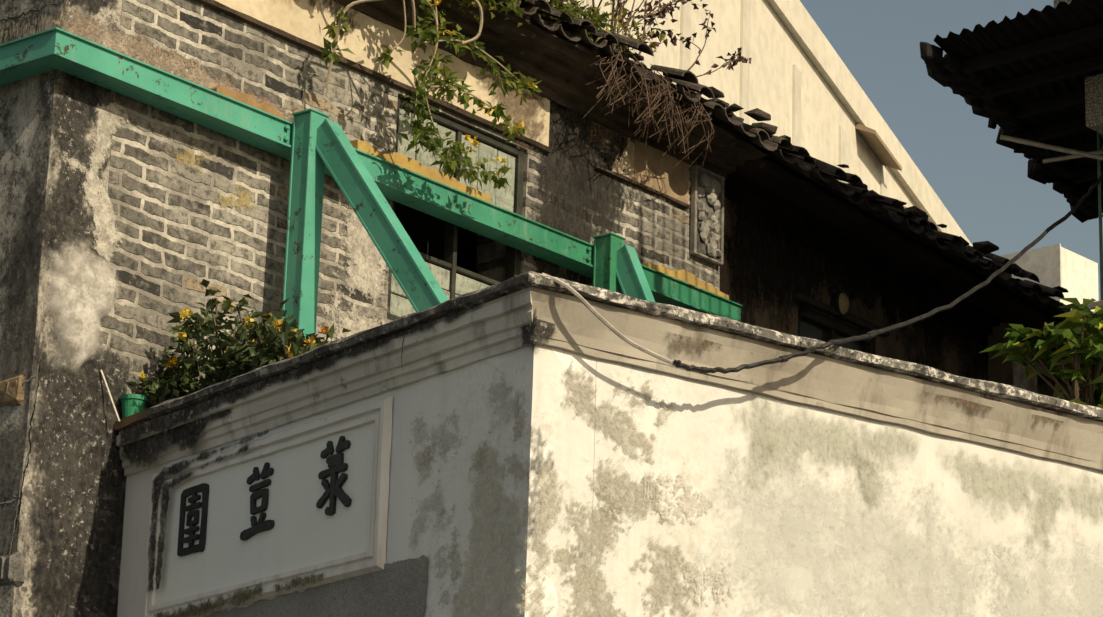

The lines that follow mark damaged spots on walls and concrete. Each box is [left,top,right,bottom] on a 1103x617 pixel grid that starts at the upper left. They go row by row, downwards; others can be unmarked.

crack [0,3,59,22]
leakage [534,256,589,285]
leakage [0,69,478,617]
leakage [905,318,1000,413]
peeling [470,367,529,470]
spalling [207,410,466,617]
peeling [505,365,712,617]
peeling [631,540,733,617]